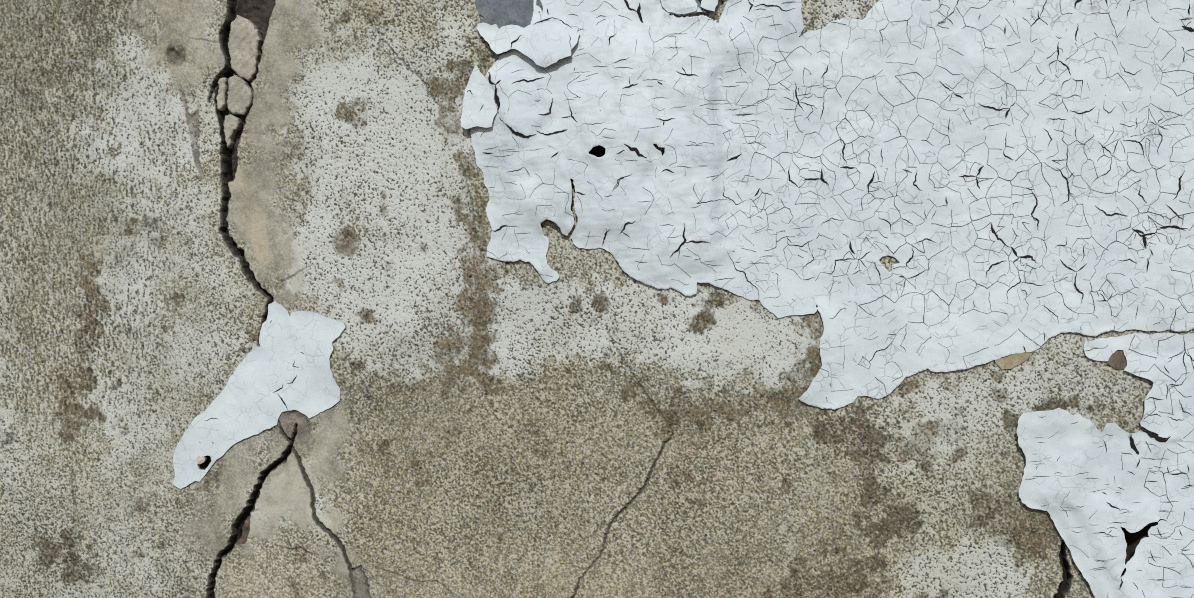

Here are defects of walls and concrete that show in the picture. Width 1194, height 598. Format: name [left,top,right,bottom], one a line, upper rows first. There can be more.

spalling [589,145,606,157]
crack [219,145,274,346]
peeling [711,0,1194,598]
peeling [173,301,347,489]
crack [207,421,370,598]
crack [571,433,674,598]